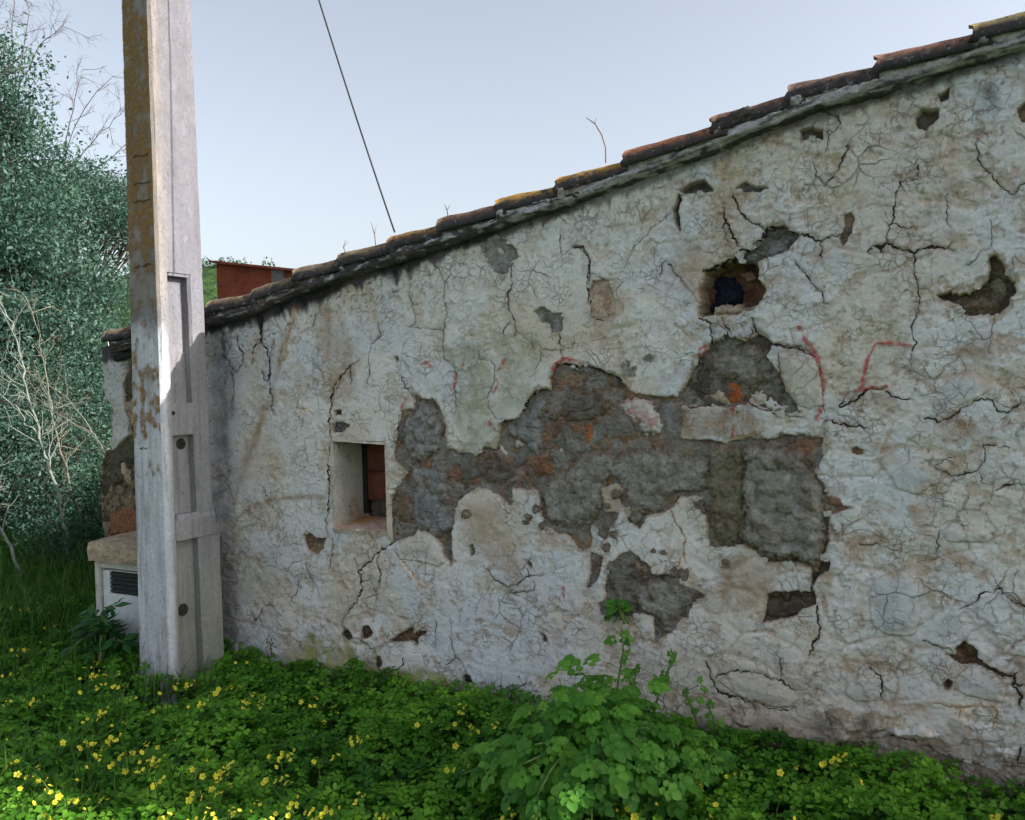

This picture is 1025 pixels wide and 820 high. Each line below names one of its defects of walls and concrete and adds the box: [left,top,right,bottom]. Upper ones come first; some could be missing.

crack [659,196,840,304]
spalling [708,227,799,319]
crack [867,164,992,377]
spalling [939,256,1016,316]
crack [478,263,622,422]
crack [681,317,1022,429]
spalling [99,358,137,537]
crack [224,309,381,625]
spalling [392,335,850,641]
spalling [392,627,427,644]
crack [706,659,804,711]
spalling [950,640,1006,677]